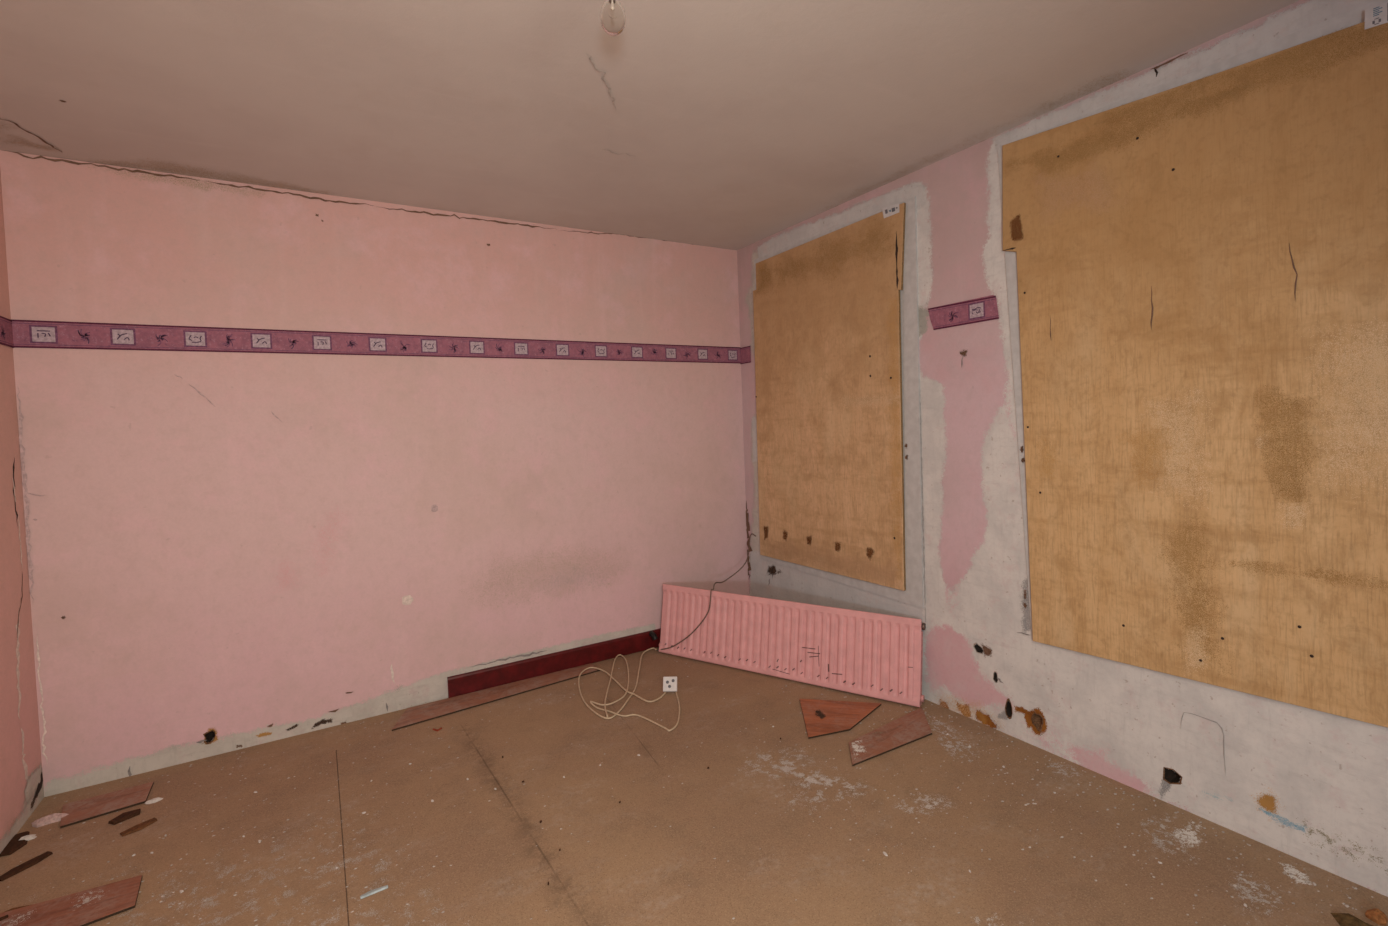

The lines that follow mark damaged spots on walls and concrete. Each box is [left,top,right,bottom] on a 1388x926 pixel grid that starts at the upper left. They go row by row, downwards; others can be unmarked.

crack [13,459,43,811]
peeling [745,0,1388,897]